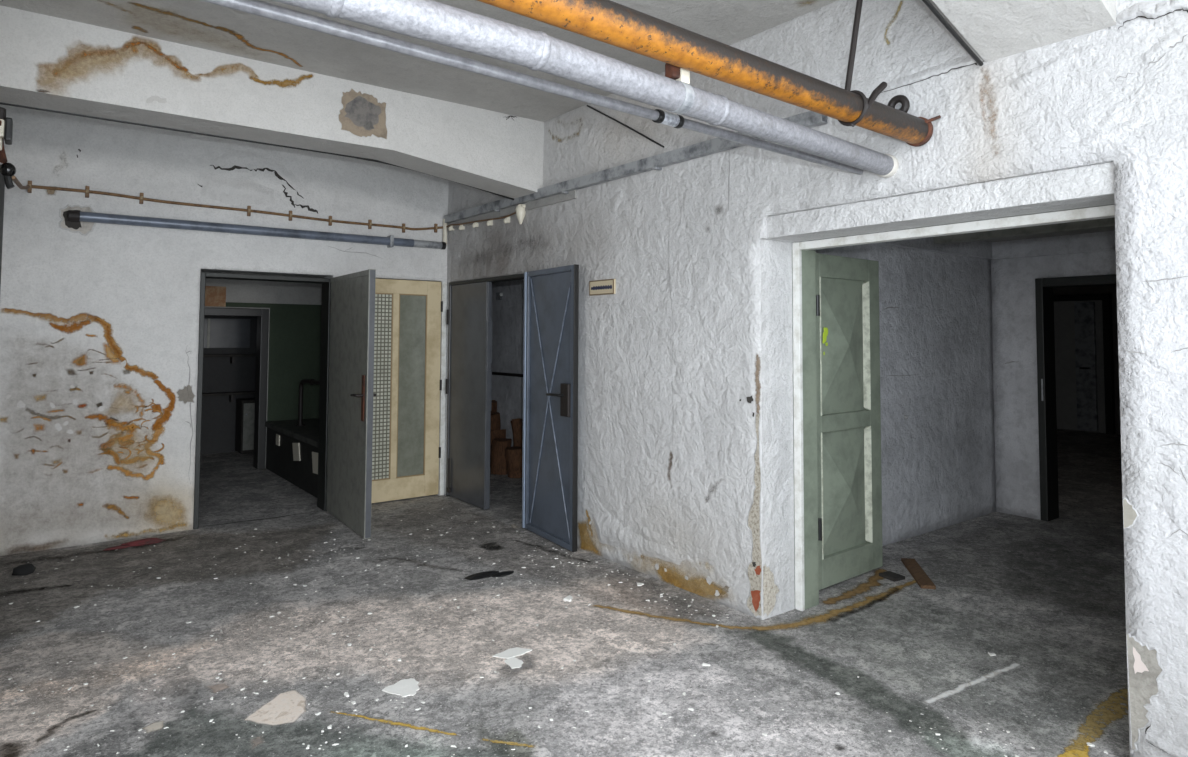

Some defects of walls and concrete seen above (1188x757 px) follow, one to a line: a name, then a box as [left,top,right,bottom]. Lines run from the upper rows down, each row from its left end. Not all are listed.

peeling [338,88,388,140]
crack [198,158,318,213]
spalling [735,395,780,617]
damp [641,556,723,597]
spalling [706,576,731,597]
spalling [1126,633,1165,754]